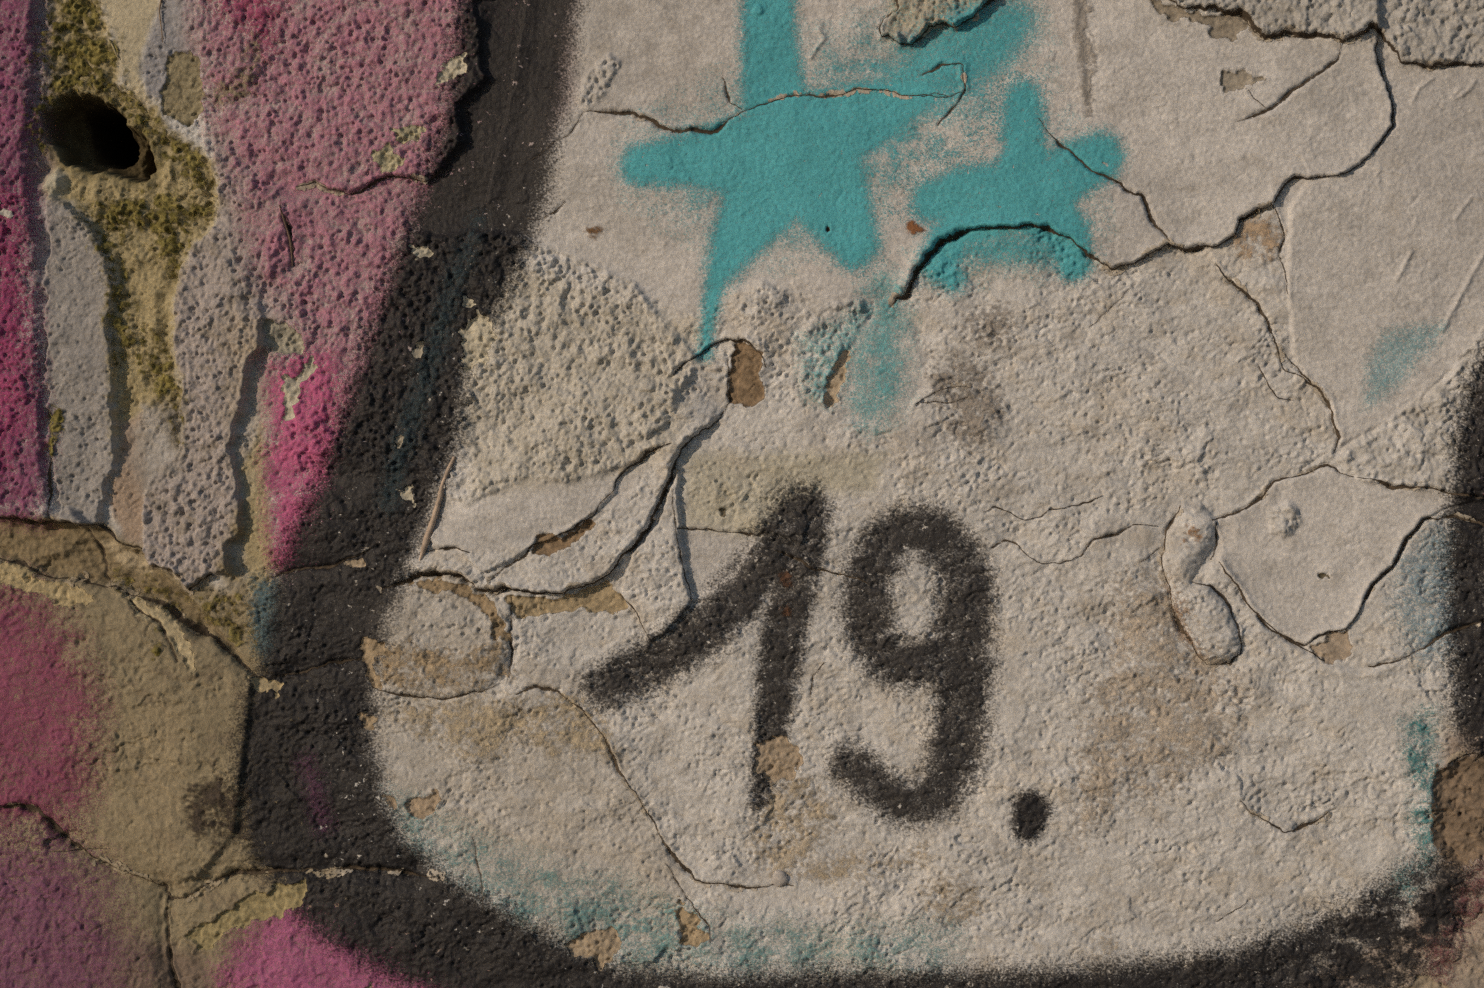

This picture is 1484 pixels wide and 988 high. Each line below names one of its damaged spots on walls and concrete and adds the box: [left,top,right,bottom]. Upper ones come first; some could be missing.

spalling [1151,0,1248,42]
crack [531,0,994,161]
spalling [726,342,765,408]
crack [888,0,1484,668]
spalling [0,560,94,607]
crack [0,459,256,676]
spalling [123,594,196,673]
crack [272,339,870,940]
crack [1240,801,1332,833]
spalling [1428,755,1484,871]
crack [0,802,483,988]
spalling [185,879,307,951]